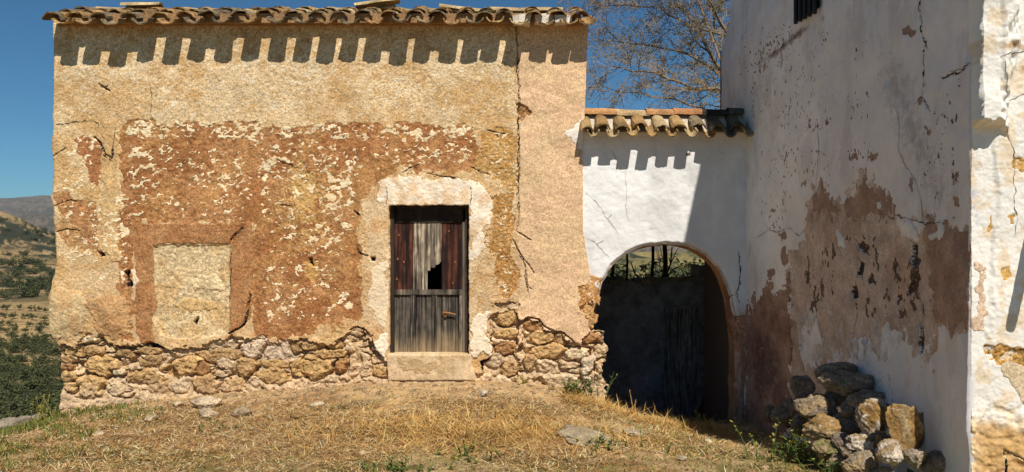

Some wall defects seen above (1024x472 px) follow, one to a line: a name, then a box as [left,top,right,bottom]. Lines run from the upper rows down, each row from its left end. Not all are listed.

crack [53,120,116,160]
crack [229,228,251,333]
flaking render [53,102,609,414]
crack [488,27,532,292]
peeling [739,24,867,134]
flaking render [728,78,988,436]
crack [884,0,946,322]
spalling [1011,157,1024,173]